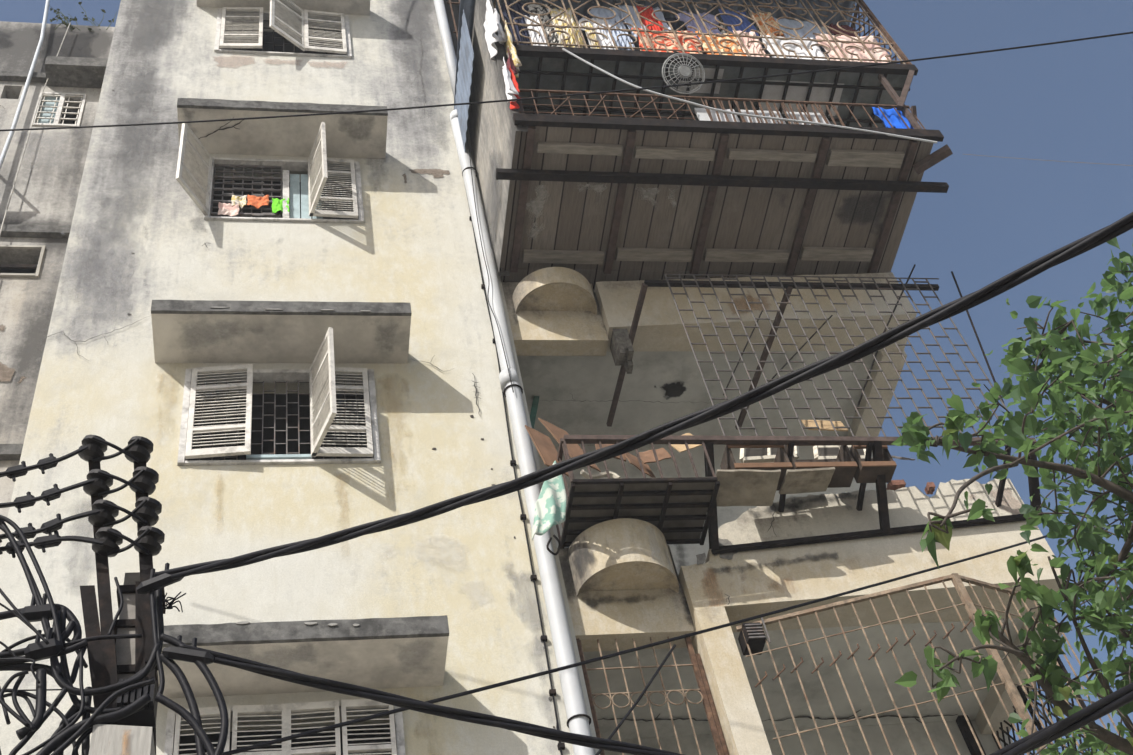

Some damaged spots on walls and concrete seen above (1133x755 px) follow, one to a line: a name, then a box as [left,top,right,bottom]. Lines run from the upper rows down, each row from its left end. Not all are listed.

leakage [42,33,94,58]
peeling [0,362,26,383]
crack [412,355,481,415]
leakage [655,382,686,400]
leakage [776,553,837,564]
leakage [560,544,646,607]